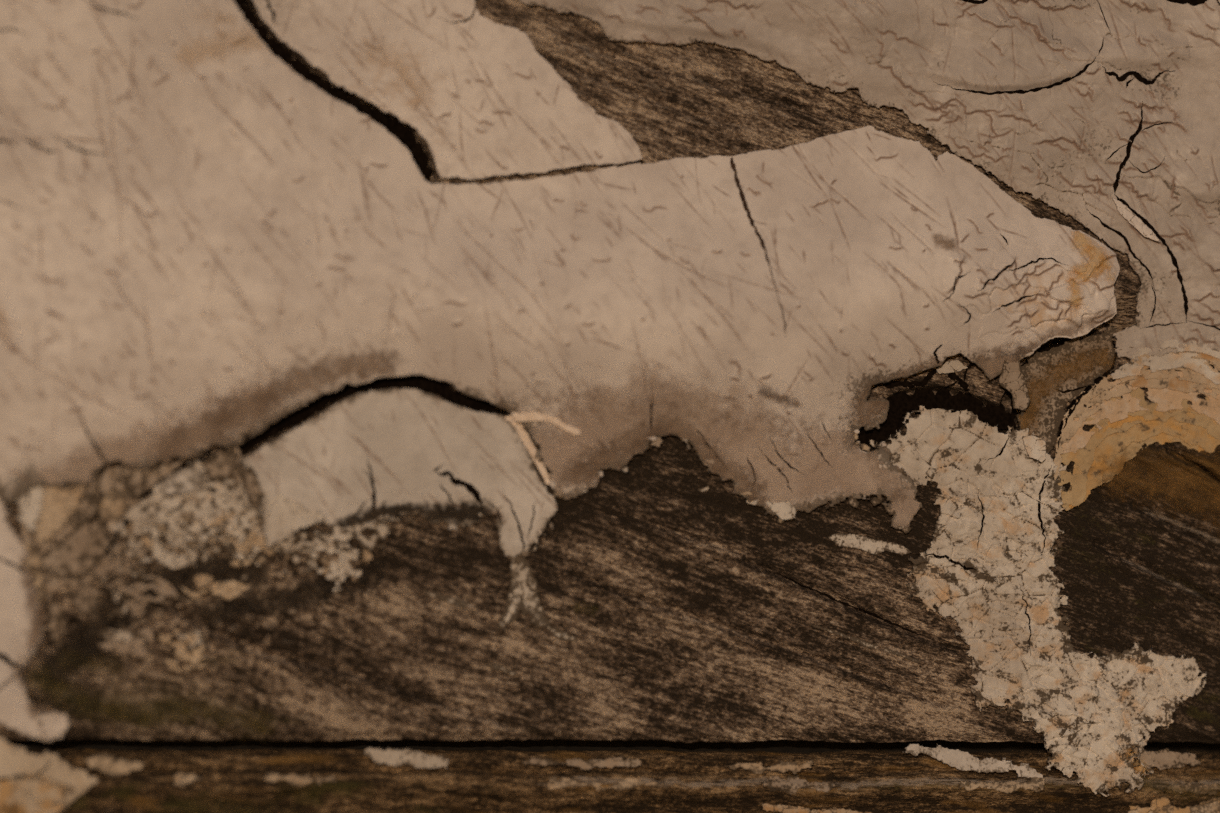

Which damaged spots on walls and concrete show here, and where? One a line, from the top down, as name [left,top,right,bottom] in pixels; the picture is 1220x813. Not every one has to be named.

crack [234,0,435,183]
crack [730,157,786,333]
crack [933,0,1220,330]
crack [78,374,506,577]
spalling [15,388,582,673]
crack [693,234,1071,491]
peeling [627,0,1220,813]
crack [1038,338,1117,559]
peeling [36,711,70,740]
peeling [84,754,145,776]
peeling [364,747,449,769]
peeling [521,756,669,791]